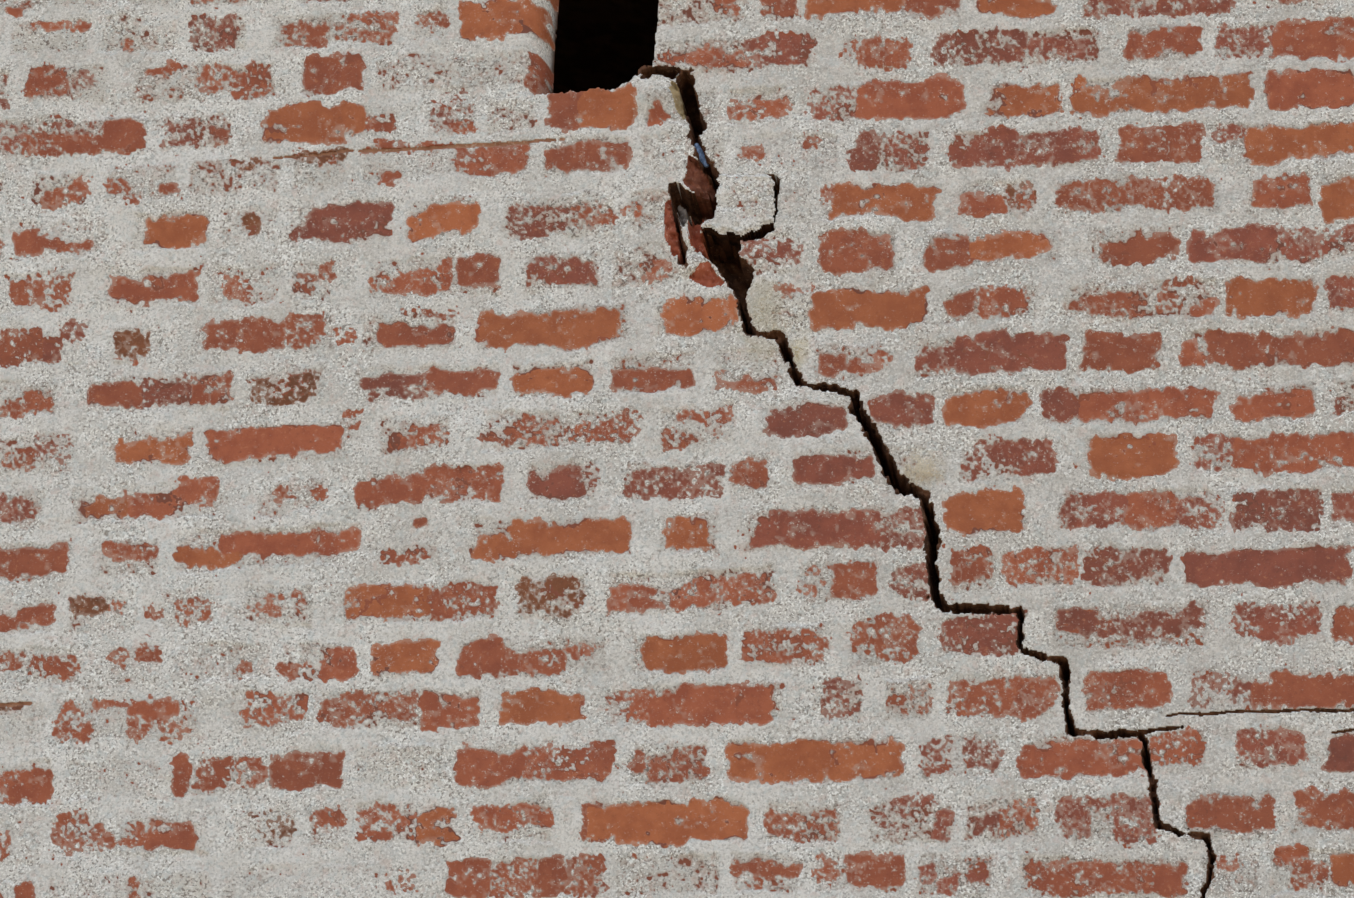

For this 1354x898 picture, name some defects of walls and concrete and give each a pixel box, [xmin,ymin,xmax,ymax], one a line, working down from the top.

crack [273,138,565,159]
crack [638,65,1354,898]